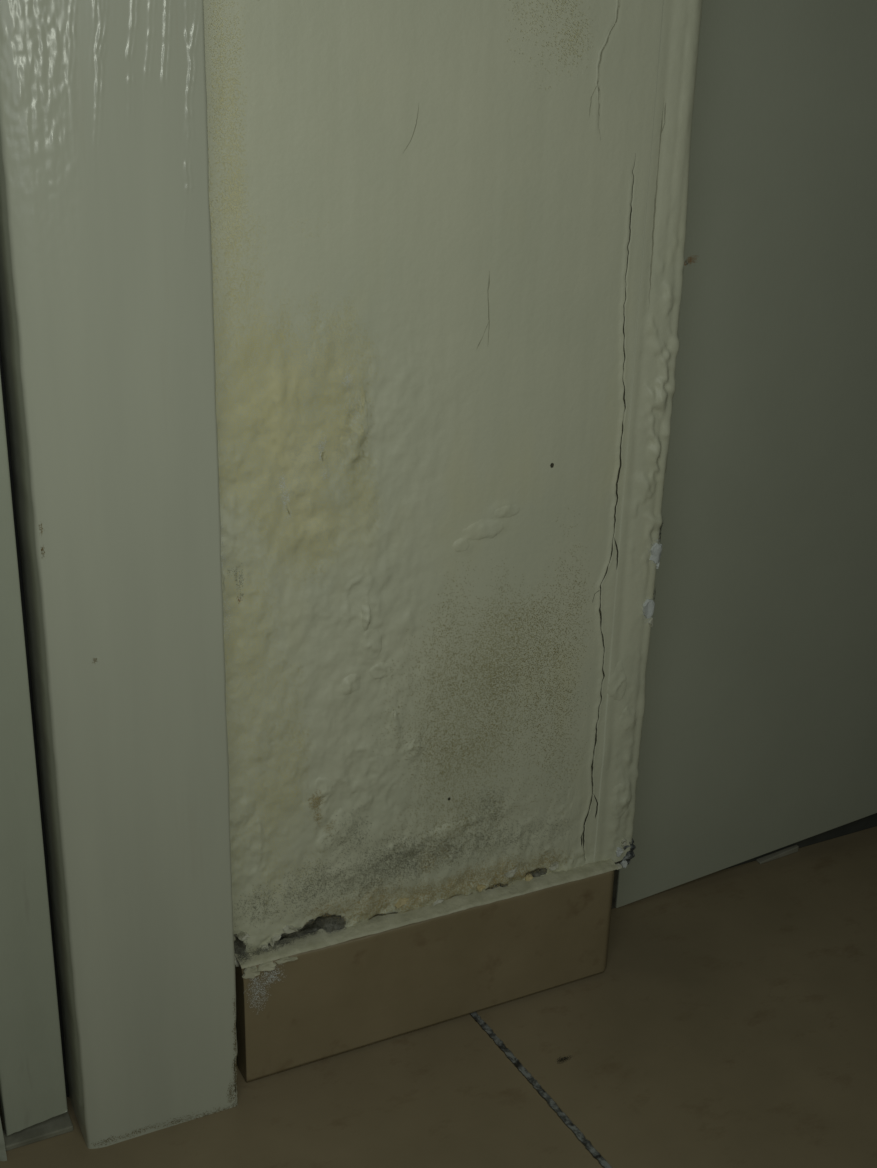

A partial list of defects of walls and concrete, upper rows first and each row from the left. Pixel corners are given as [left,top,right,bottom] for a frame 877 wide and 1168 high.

crack [581,103,666,861]
water stain [235,524,601,927]
spalling [227,838,636,1108]